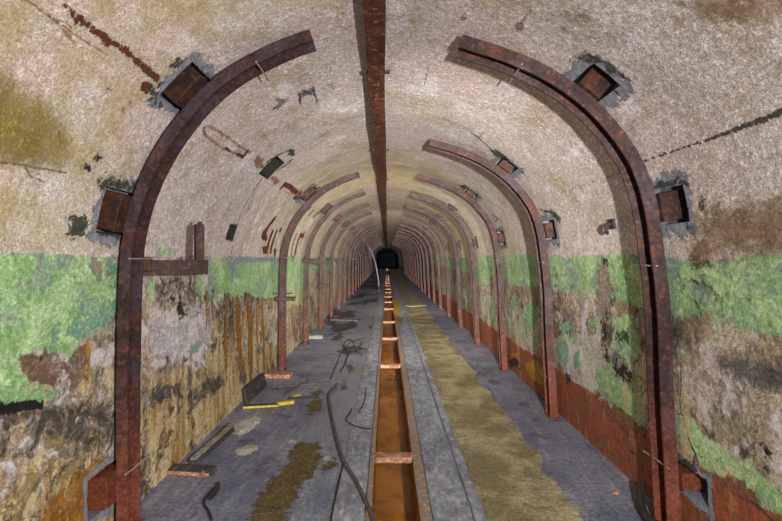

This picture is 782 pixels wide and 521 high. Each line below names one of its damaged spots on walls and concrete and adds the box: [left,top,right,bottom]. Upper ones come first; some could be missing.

rust [28,0,160,94]
spalling [146,52,219,116]
spalling [562,50,635,110]
crack [644,109,782,162]
spalling [651,168,707,240]
peeling [18,172,139,390]
rust [224,292,265,387]
damp [600,317,635,388]
spalling [677,455,715,521]
peeling [724,472,760,504]